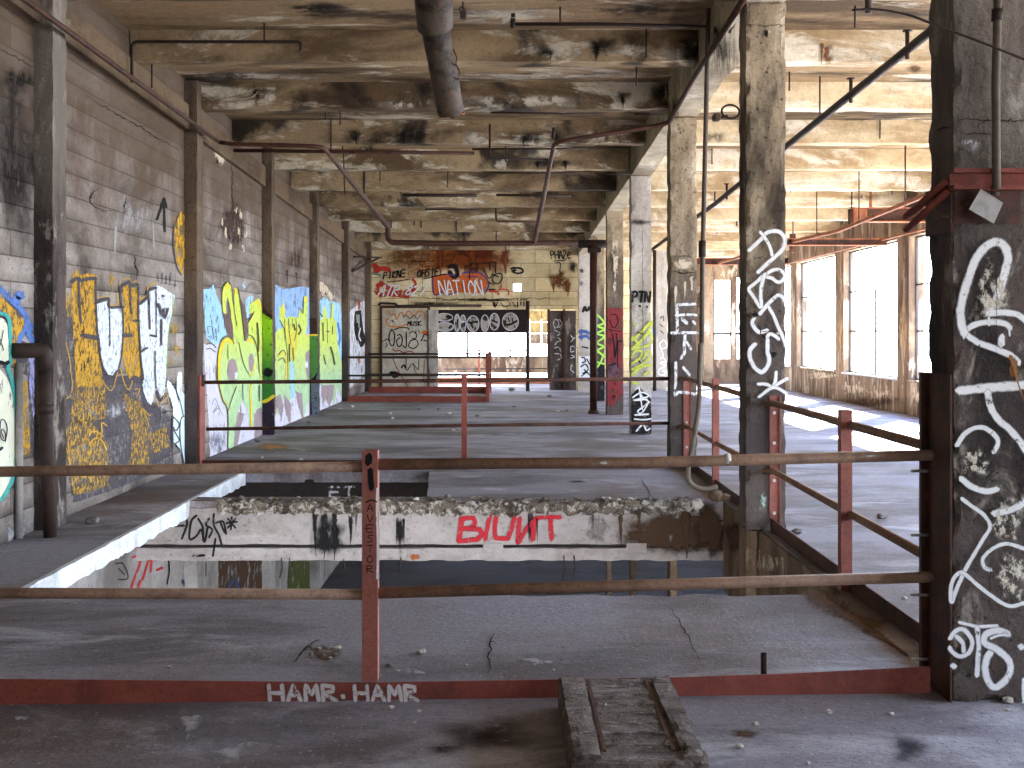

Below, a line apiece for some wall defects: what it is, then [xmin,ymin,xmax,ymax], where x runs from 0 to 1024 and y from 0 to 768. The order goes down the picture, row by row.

damp [523,96,565,106]
damp [467,133,485,146]
rust [388,250,509,274]
rust [549,272,571,295]
spalling [217,495,362,518]
spalling [379,494,700,541]
rust [618,503,740,558]
crack [668,607,702,665]
crack [487,634,497,673]